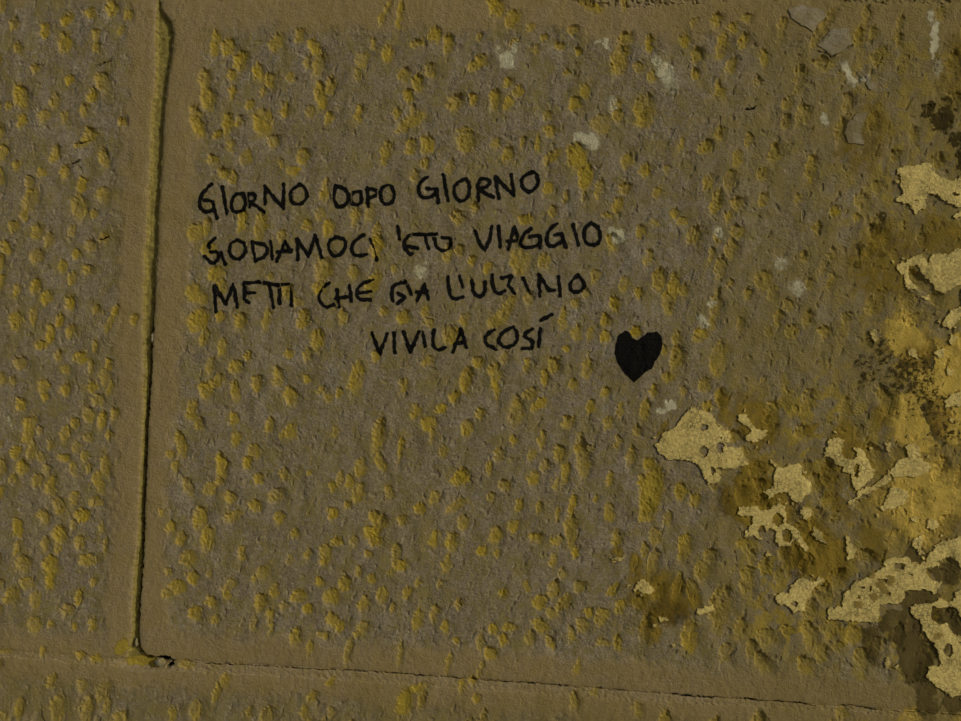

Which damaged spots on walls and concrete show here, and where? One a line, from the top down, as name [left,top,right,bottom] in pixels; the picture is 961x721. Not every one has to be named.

damp [921,10,961,170]
peeling [894,162,961,219]
damp [848,216,961,292]
peeling [891,248,961,301]
peeling [933,307,961,358]
peeling [640,404,770,515]
peeling [737,459,828,557]
peeling [823,430,931,517]
peeling [627,579,655,597]
peeling [696,604,715,615]
peeling [773,575,825,614]
peeling [827,516,961,699]